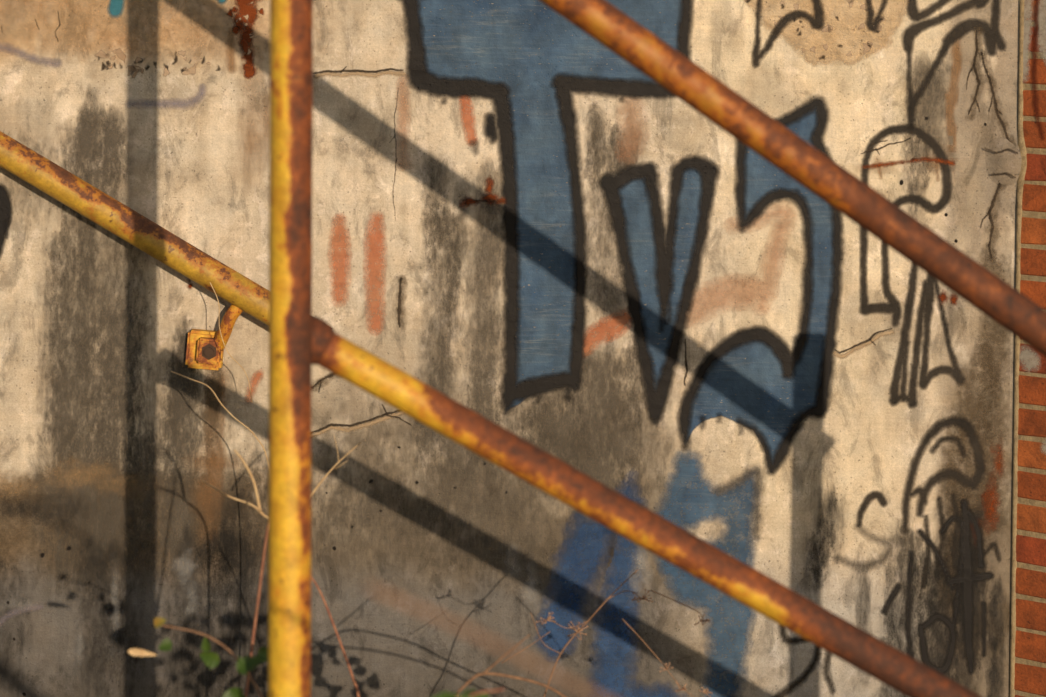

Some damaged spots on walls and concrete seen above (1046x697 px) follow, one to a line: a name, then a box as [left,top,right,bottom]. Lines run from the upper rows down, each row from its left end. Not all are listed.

peeling [95,0,222,78]
rust [227,0,263,78]
peeling [746,0,908,64]
crack [966,29,1013,144]
leakage [65,91,126,200]
crack [314,66,405,208]
crack [980,183,1003,258]
crack [834,328,894,358]
leakage [0,216,268,697]